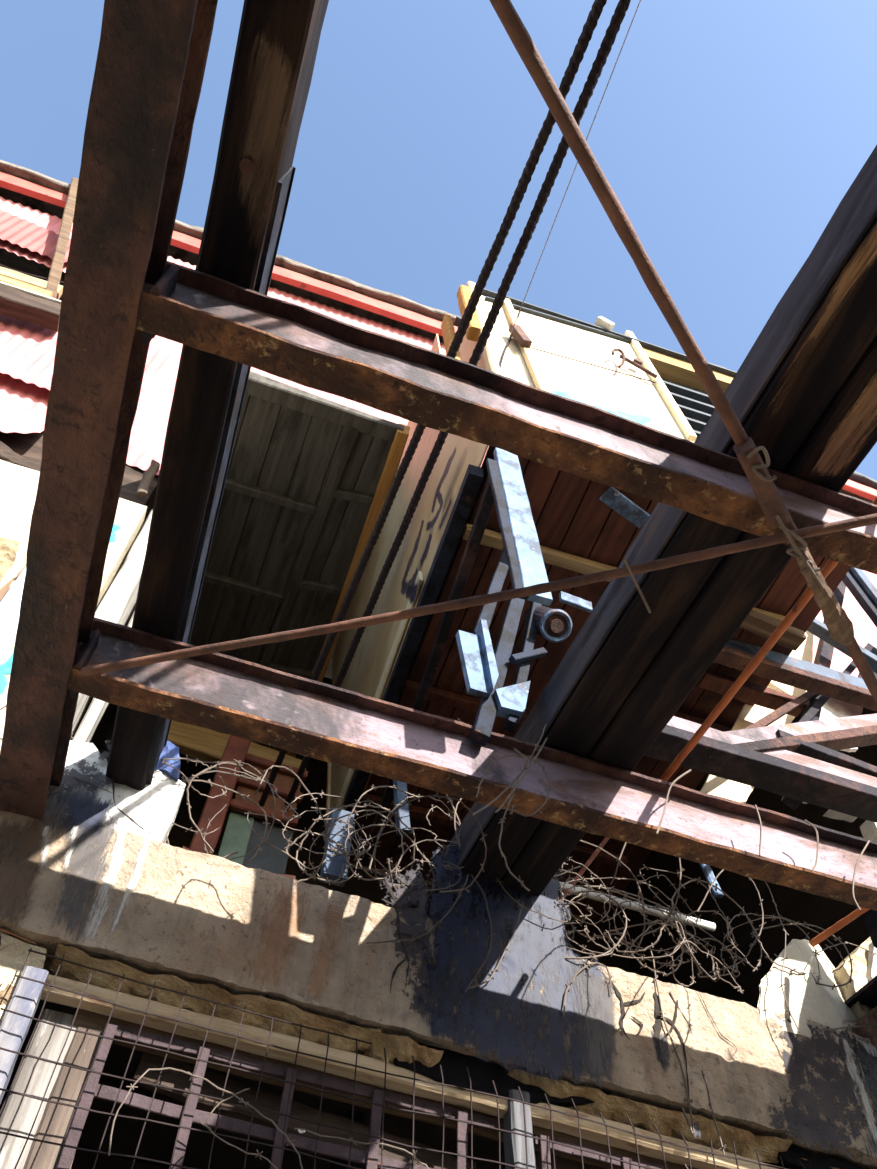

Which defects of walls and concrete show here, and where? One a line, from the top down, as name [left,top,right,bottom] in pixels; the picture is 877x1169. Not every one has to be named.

rust [0,821,51,925]
crack [0,928,37,950]